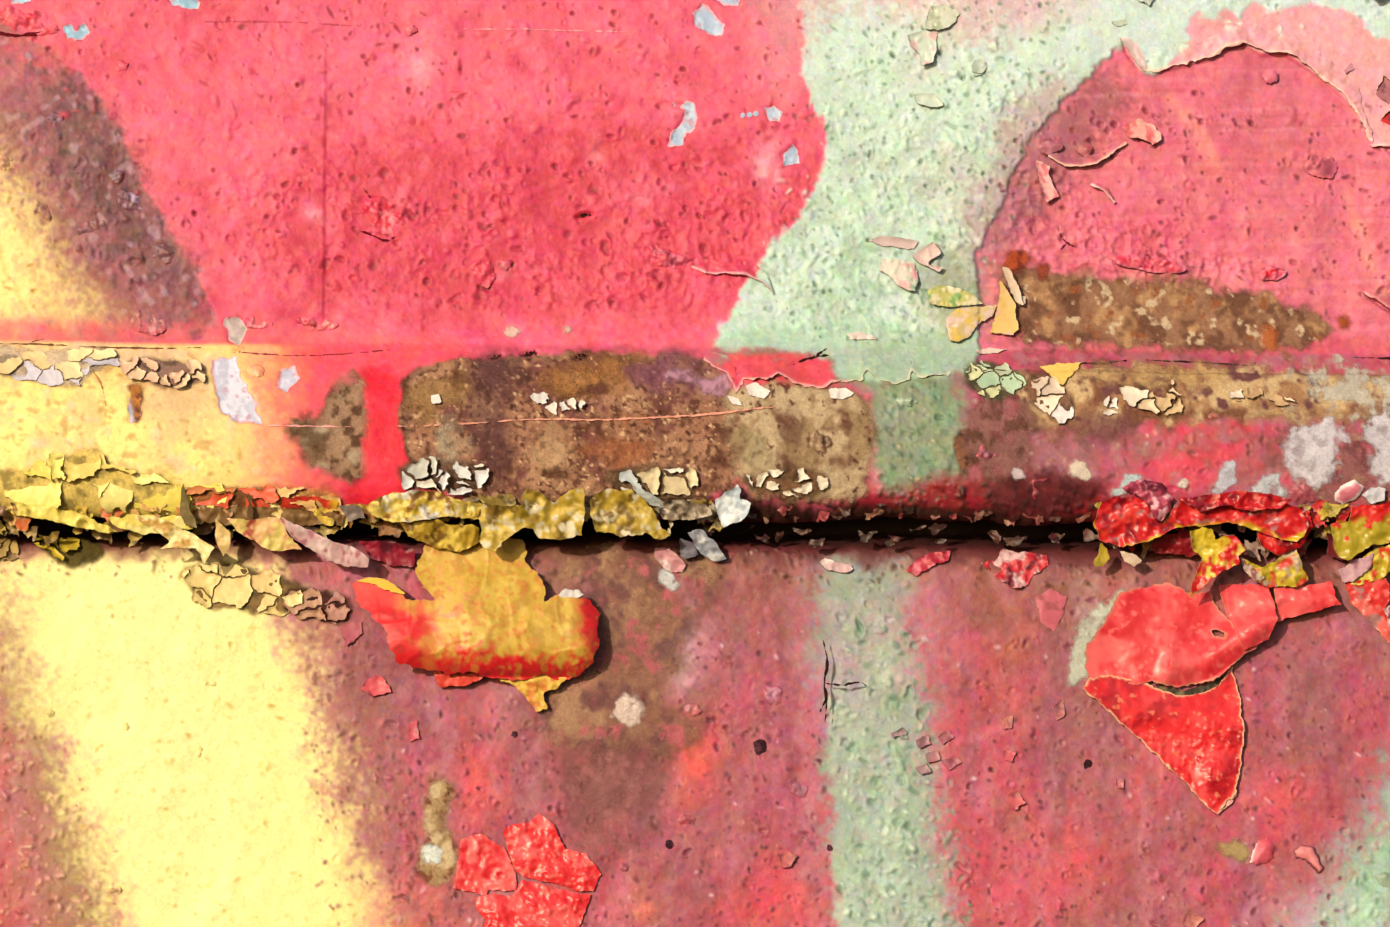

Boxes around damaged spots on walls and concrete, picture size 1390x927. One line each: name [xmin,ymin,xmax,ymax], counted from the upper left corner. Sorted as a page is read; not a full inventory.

peeling [63,23,90,41]
peeling [169,0,200,9]
peeling [667,101,698,147]
peeling [692,0,740,36]
peeling [1036,119,1161,203]
peeling [1112,19,1390,148]
peeling [691,236,1081,424]
corrosion [290,371,366,483]
corrosion [398,350,877,510]
corrosion [953,250,1390,526]
peeling [0,449,1390,814]
peeling [453,813,601,927]